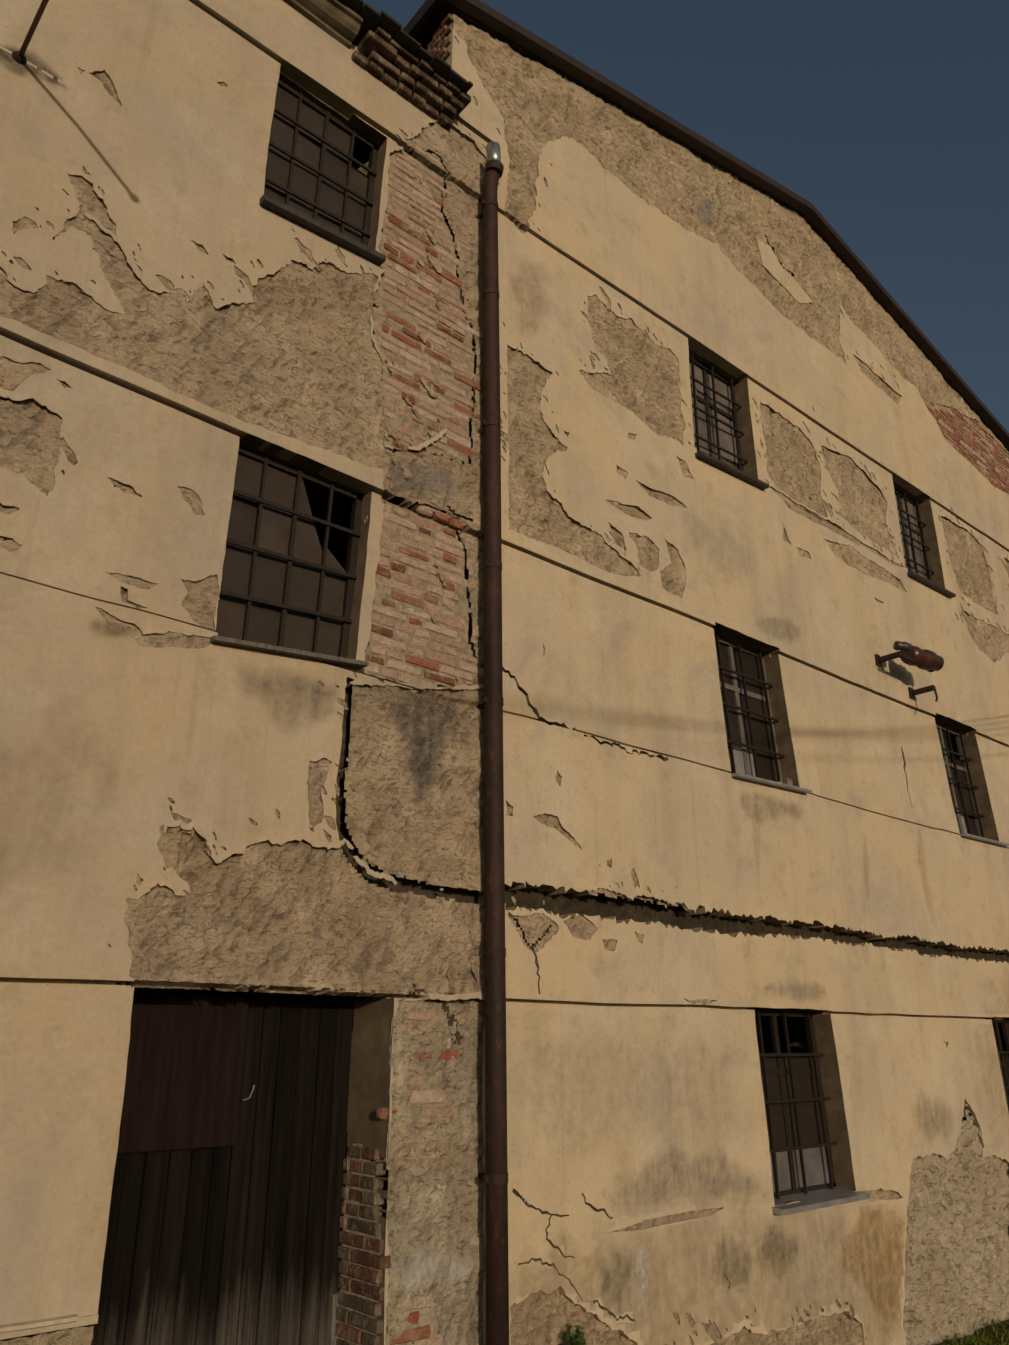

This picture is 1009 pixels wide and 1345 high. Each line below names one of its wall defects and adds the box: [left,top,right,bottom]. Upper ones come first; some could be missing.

peeling [425,13,1009,495]
peeling [500,343,686,597]
peeling [753,400,906,592]
peeling [940,508,1009,663]
spalling [0,26,487,1345]
peeling [508,896,616,953]
spalling [589,869,691,911]
crack [332,688,1009,962]
crack [512,1190,630,1320]
spalling [510,1289,635,1345]
spalling [674,1300,863,1345]
spalling [861,1104,1009,1345]